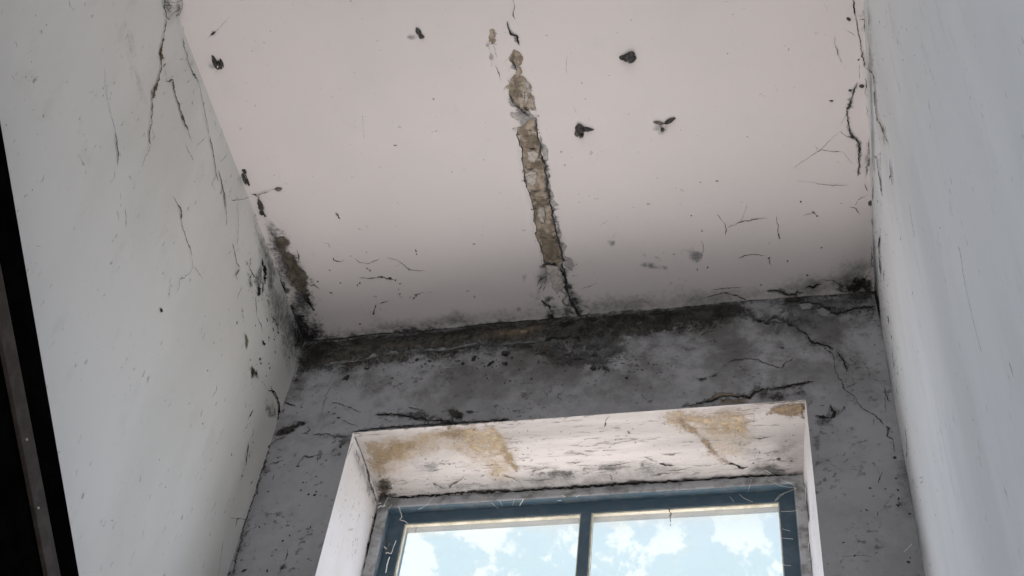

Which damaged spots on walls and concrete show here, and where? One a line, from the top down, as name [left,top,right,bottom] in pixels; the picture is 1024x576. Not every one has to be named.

crack [79,20,240,277]
flaking render [487,29,577,294]
crack [800,1,907,217]
leakage [271,421,342,448]
crack [271,229,673,489]
leakage [367,428,796,499]
leakage [289,211,892,375]
leakage [667,412,746,462]
crack [682,206,923,514]